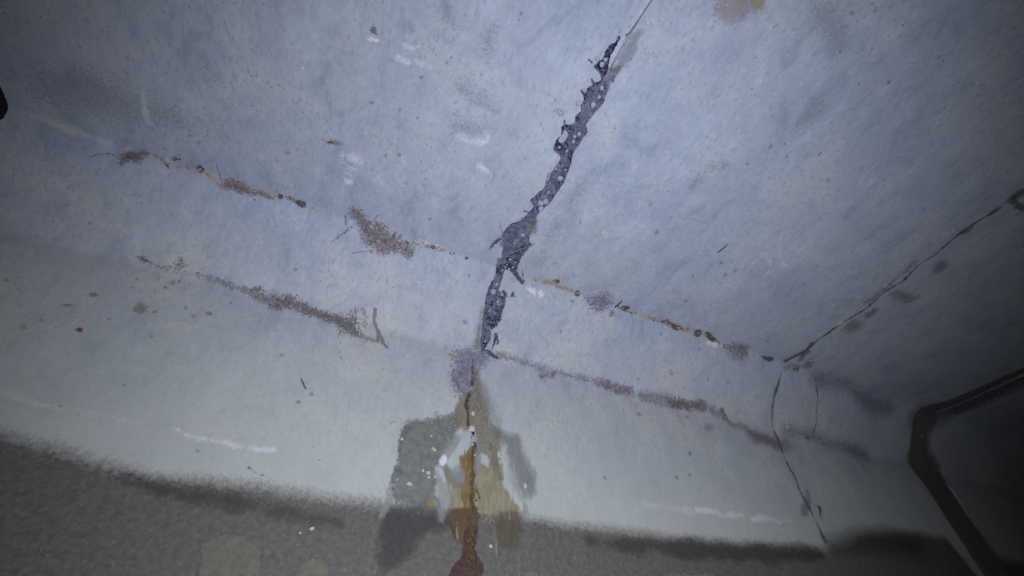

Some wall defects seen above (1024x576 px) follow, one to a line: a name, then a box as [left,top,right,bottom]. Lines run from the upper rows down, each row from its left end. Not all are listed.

crack [464,359,480,576]
corrosion [427,389,520,576]
water stain [449,346,534,494]
water stain [0,411,1024,576]